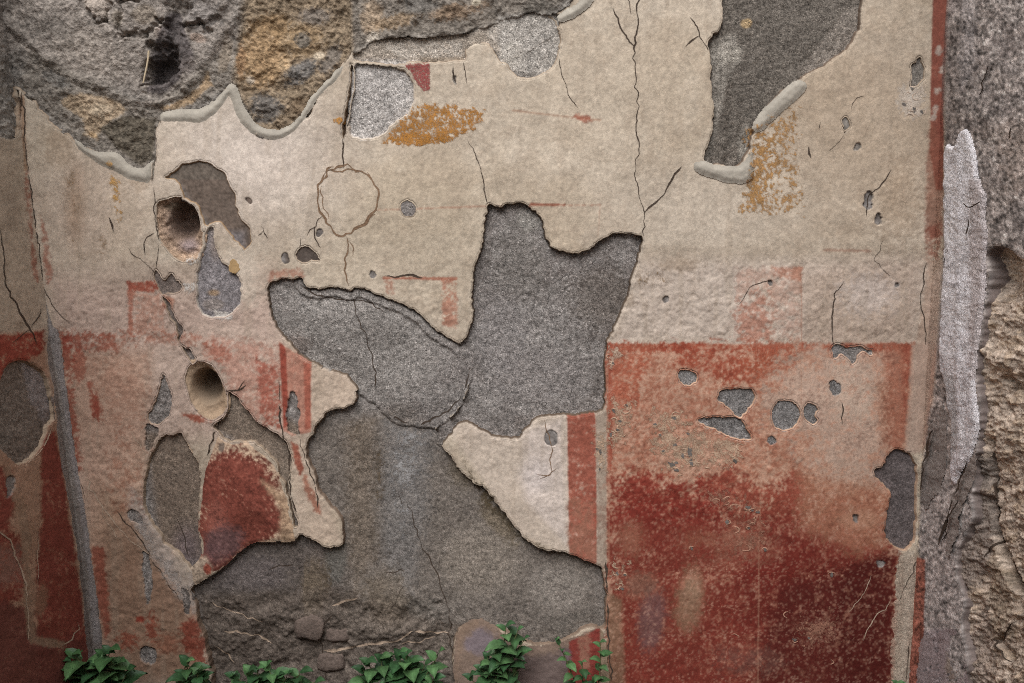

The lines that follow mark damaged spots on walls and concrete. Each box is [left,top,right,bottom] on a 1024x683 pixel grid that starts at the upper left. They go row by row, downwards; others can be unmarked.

crack [1,90,66,343]
spalling [0,0,644,683]
crack [299,139,473,425]
crack [613,0,682,235]
spalling [702,0,864,166]
spalling [767,399,819,445]
spalling [873,404,977,556]